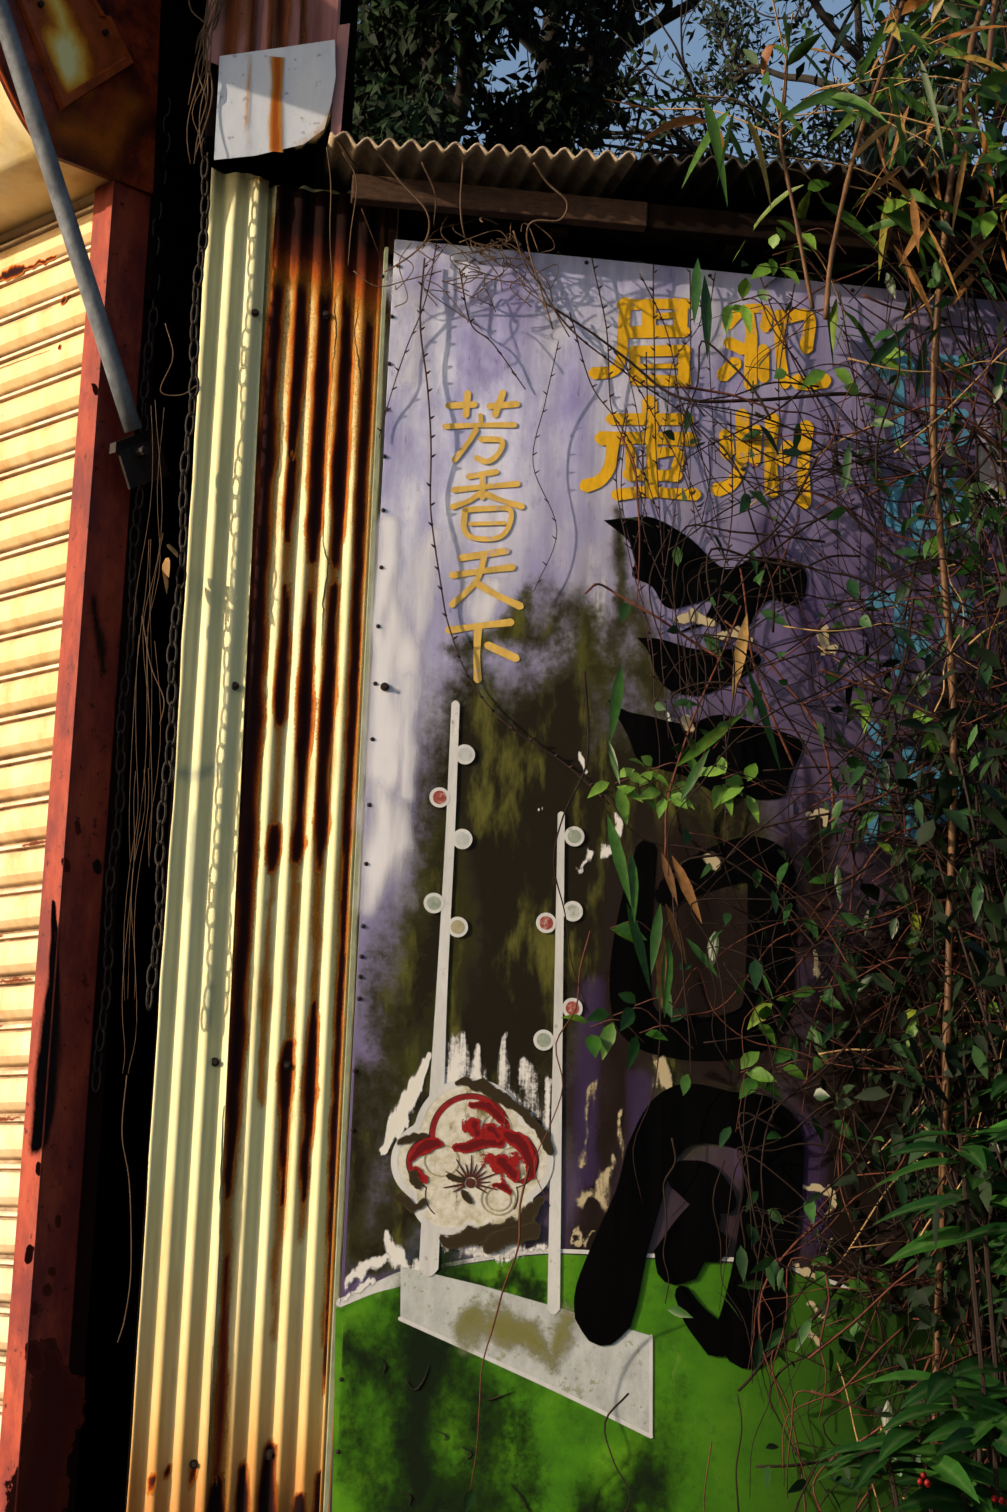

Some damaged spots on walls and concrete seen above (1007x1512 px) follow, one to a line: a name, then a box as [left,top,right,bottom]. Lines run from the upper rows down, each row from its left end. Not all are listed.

rust [222,0,307,152]
rust [146,177,398,1512]